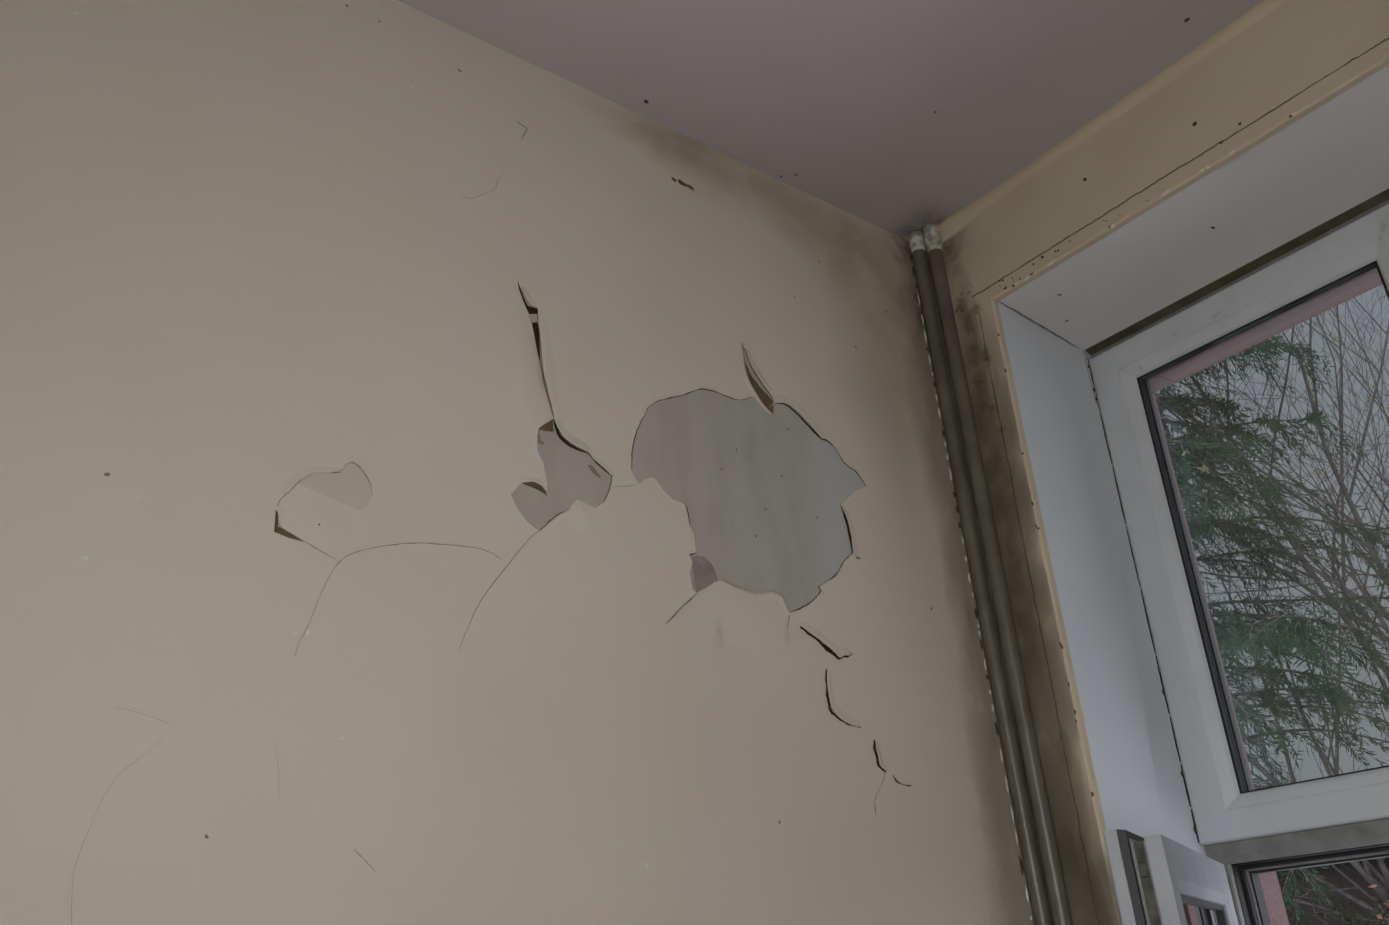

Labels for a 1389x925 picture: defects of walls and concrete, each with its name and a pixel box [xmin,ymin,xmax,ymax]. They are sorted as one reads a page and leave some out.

peeling [507,343,868,654]
crack [787,615,912,814]